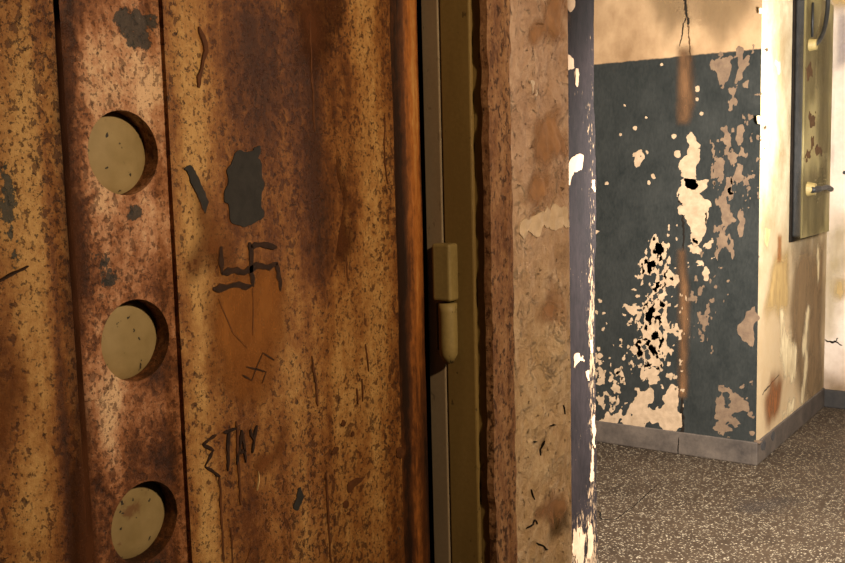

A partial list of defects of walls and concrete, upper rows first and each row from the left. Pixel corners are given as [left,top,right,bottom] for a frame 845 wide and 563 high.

corrosion [196,26,209,88]
crack [679,0,691,61]
peeling [710,44,754,111]
corrosion [62,77,82,358]
crack [677,200,685,250]
peeling [573,114,766,482]
corrosion [215,269,282,397]
corrosion [356,344,369,404]
crack [677,396,685,454]
corrosion [77,384,96,563]
corrosion [218,477,234,563]
peeling [572,521,594,563]